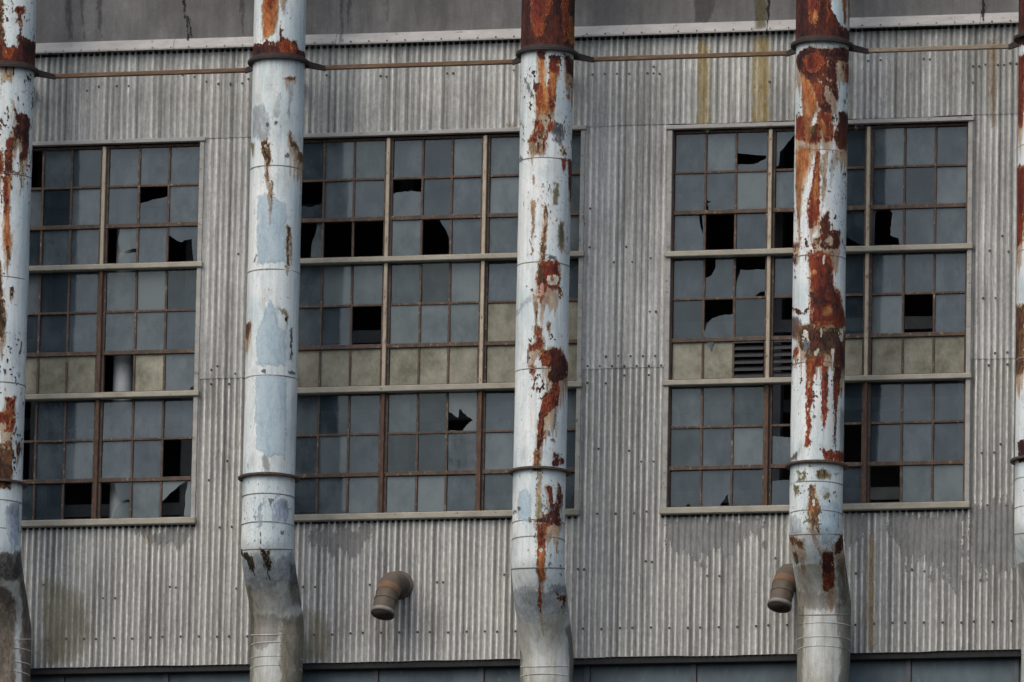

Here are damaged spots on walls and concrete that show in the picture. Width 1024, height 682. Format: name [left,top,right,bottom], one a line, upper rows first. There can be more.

rust [0,0,36,83]
rust [253,0,305,63]
rust [521,0,575,159]
rust [561,145,572,213]
rust [793,0,850,330]
rust [0,105,30,358]
rust [1016,304,1024,395]
rust [241,548,272,580]
rust [789,536,805,574]
rust [820,535,847,610]